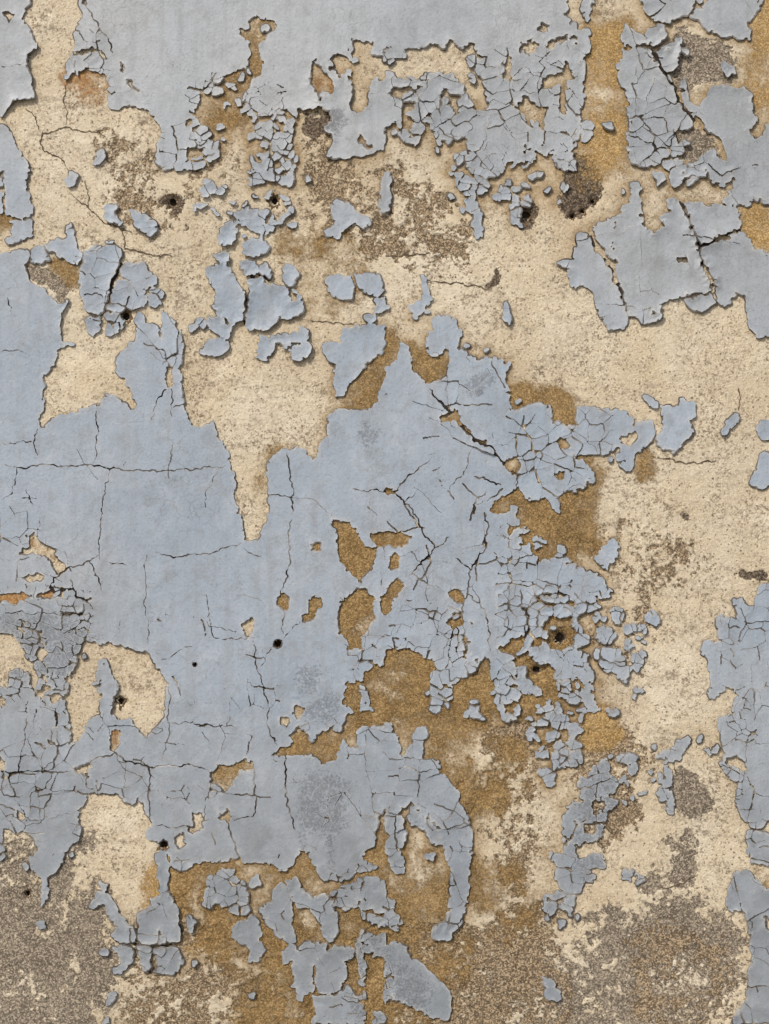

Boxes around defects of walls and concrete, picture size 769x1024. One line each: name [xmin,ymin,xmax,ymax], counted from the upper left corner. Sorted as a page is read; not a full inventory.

peeling [240,16,276,68]
peeling [311,59,334,101]
peeling [546,36,577,53]
crack [634,48,708,152]
crack [679,201,741,286]
peeling [439,381,494,455]
crack [431,390,519,485]
crack [50,501,198,616]
crack [368,474,435,571]
crack [458,505,488,571]
peeling [463,699,486,722]
peeling [208,758,256,798]